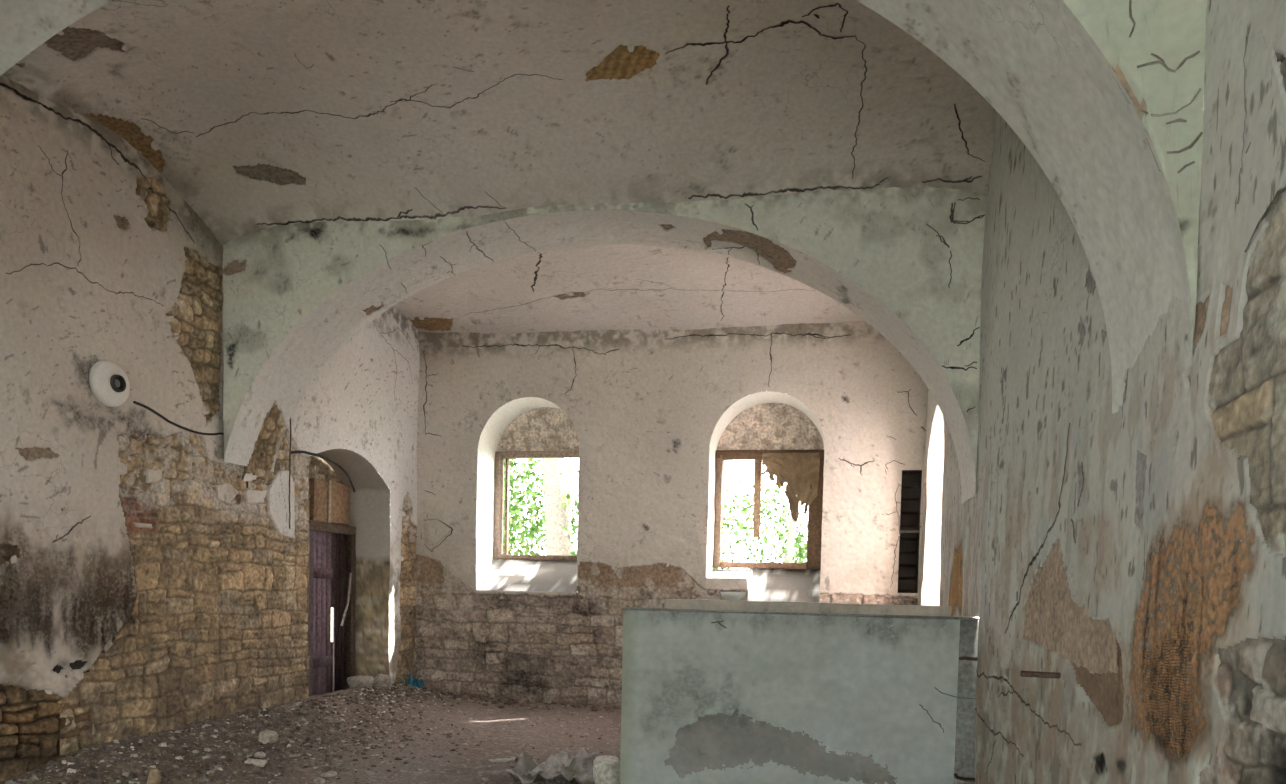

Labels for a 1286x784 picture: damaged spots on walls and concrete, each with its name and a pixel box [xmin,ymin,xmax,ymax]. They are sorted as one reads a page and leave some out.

peeling [44,27,138,61]
crack [1129,0,1203,174]
crack [0,82,195,307]
crack [257,187,677,395]
spalling [701,228,797,273]
crack [665,2,888,387]
crack [922,104,985,288]
water stain [0,527,137,658]
flaking render [0,247,316,781]
flaking render [201,492,748,784]
peeling [1023,538,1125,727]
flaking render [1199,636,1286,784]